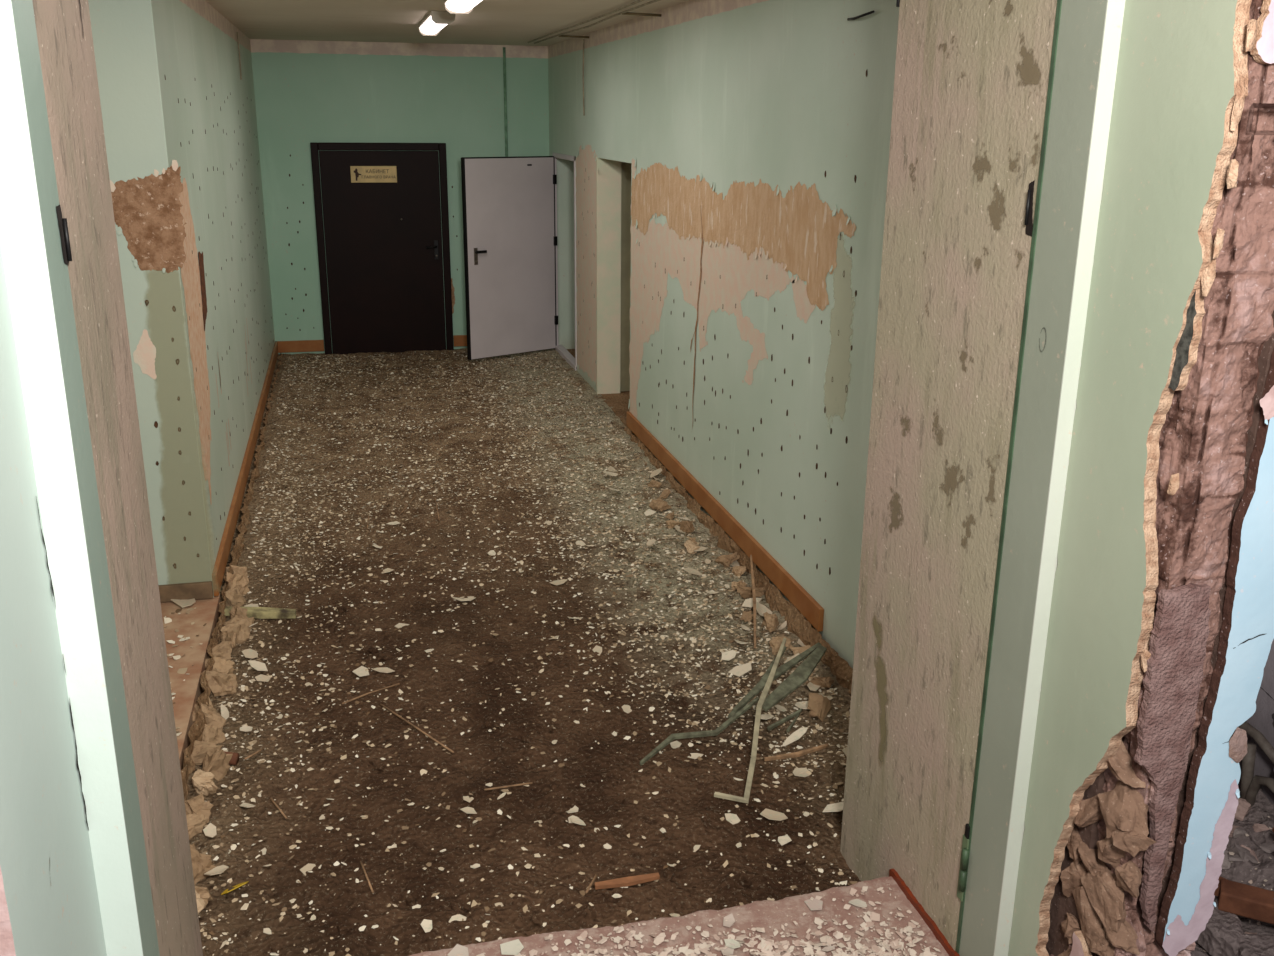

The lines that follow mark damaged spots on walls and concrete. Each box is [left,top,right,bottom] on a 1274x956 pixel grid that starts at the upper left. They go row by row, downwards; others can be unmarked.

flaking render [110,84,259,502]
peeling [628,157,856,442]
spalling [1058,739,1157,956]
flaking render [1141,649,1151,672]
peeling [1162,779,1240,956]
spalling [1223,727,1247,763]